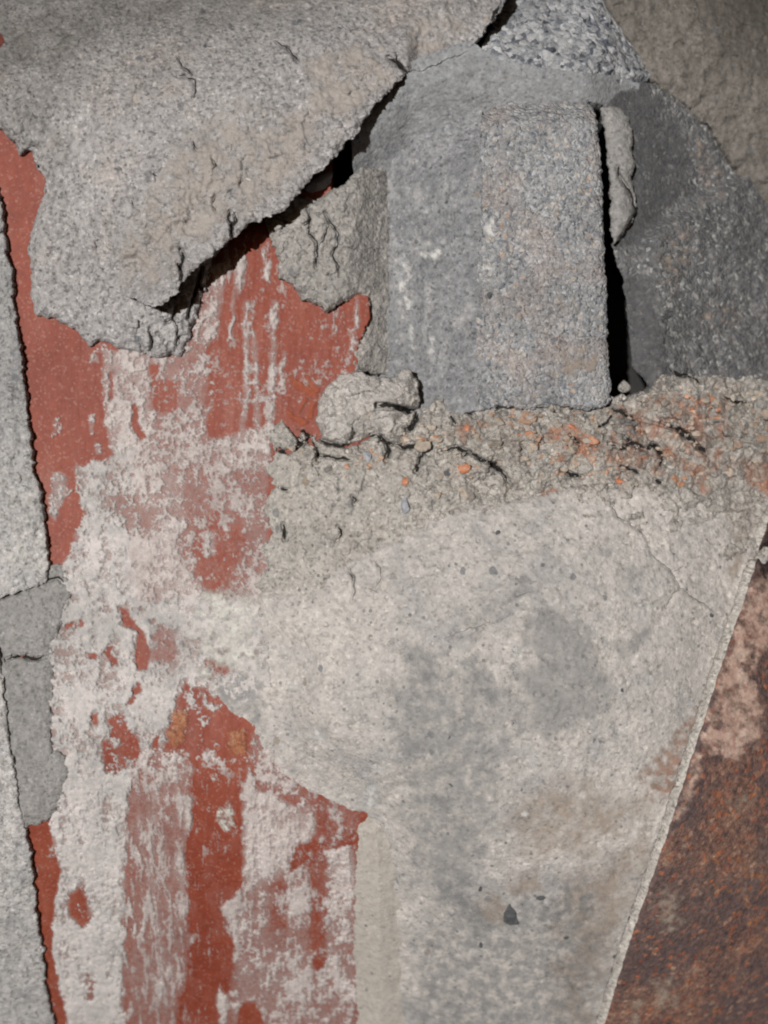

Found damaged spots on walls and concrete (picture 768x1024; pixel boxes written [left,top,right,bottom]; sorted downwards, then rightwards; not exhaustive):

crack [178,59,196,98]
crack [388,55,408,74]
crack [211,198,238,234]
crack [303,212,340,276]
crack [617,166,637,239]
crack [150,250,203,351]
peeling [48,444,272,1024]
corrosion [648,724,693,793]
peeling [213,725,359,1024]